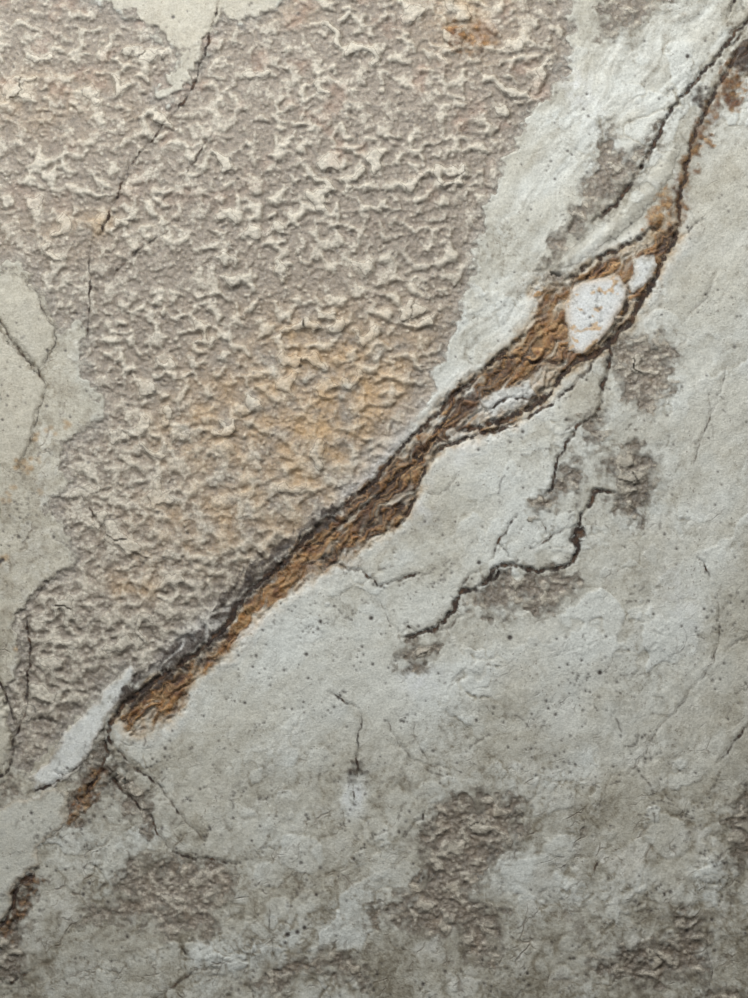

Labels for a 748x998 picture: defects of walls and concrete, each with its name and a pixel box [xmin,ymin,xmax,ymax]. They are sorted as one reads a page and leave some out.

corrosion [446,26,489,45]
spalling [0,0,588,985]
crack [35,0,748,835]
corrosion [121,41,748,731]
crack [0,620,32,777]
crack [175,851,227,863]
spalling [254,950,373,998]